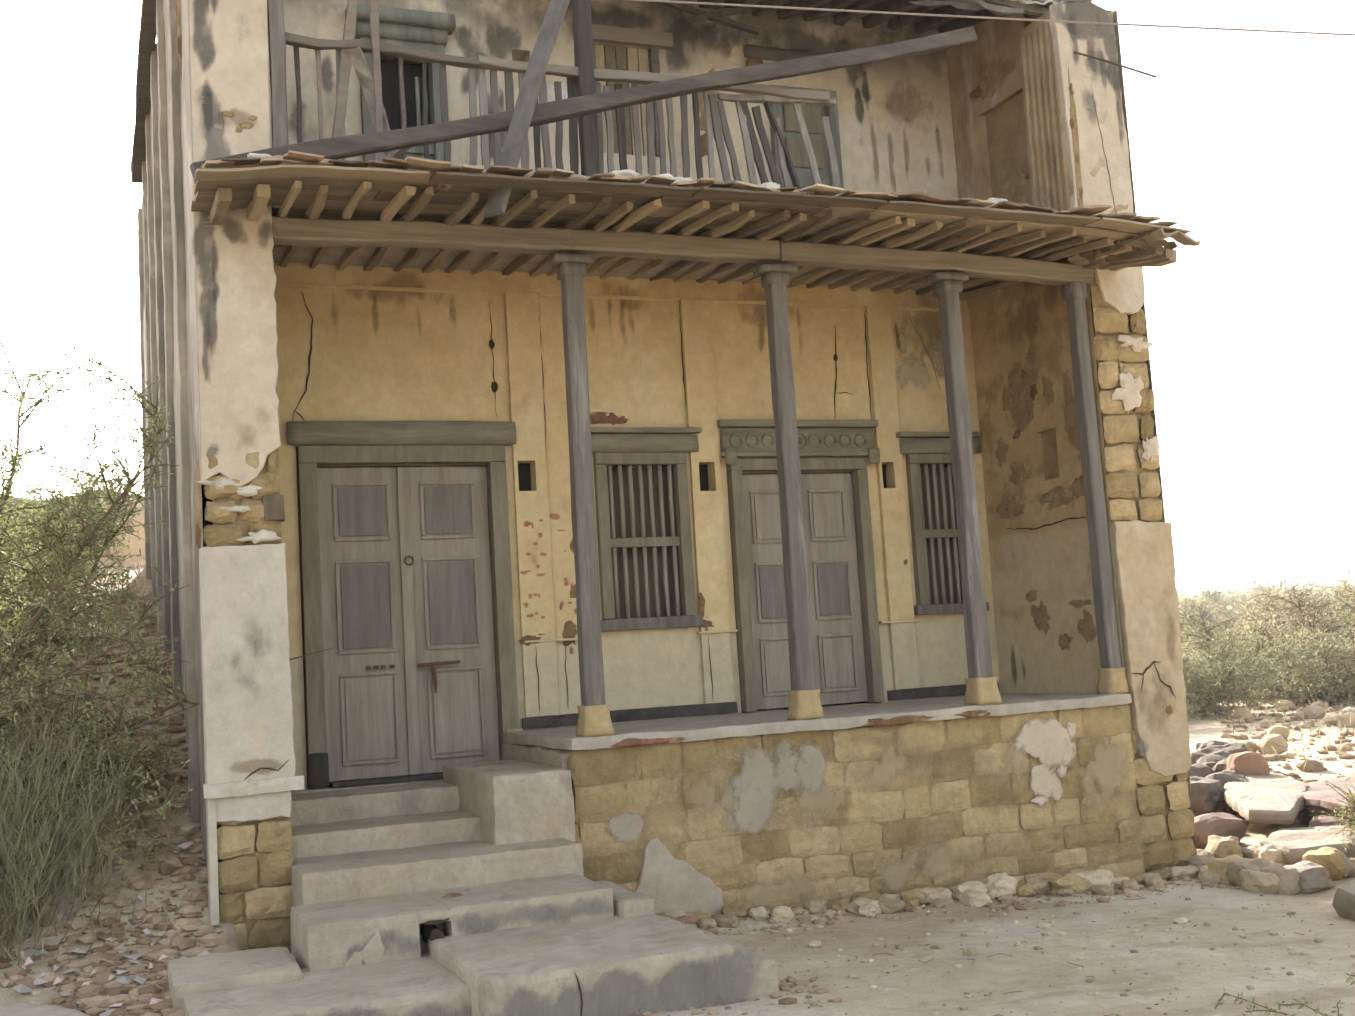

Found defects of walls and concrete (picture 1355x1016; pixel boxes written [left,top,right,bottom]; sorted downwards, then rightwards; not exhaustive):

crack [292,291,313,421]
crack [489,306,498,417]
peeling [590,412,629,425]
crack [833,313,872,420]
peeling [995,344,1085,520]
spalling [1090,267,1163,522]
spalling [194,451,282,549]
spalling [518,634,545,646]
spalling [562,620,577,654]
crack [1132,661,1176,714]